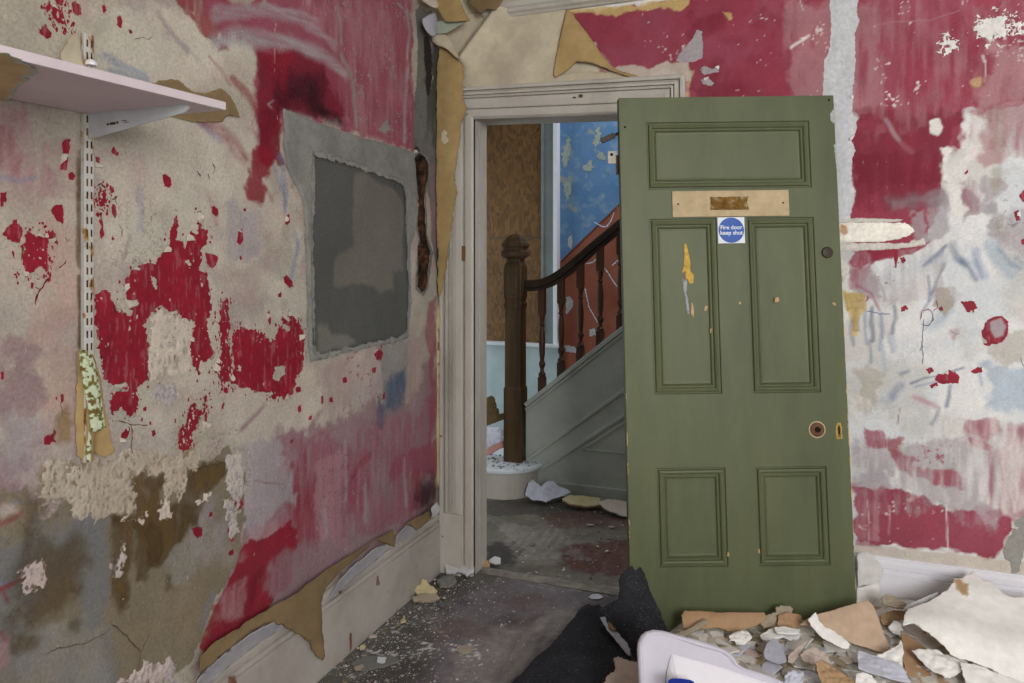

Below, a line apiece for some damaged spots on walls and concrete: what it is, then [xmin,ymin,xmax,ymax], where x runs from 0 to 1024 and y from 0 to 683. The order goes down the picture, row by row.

spalling [936,6,1024,56]
spalling [414,150,434,296]
peeling [94,206,312,453]
peeling [961,301,977,314]
peeling [982,316,1009,346]
peeling [926,367,984,389]
water stain [113,462,226,607]
peeling [192,512,213,538]
spalling [1003,515,1024,574]